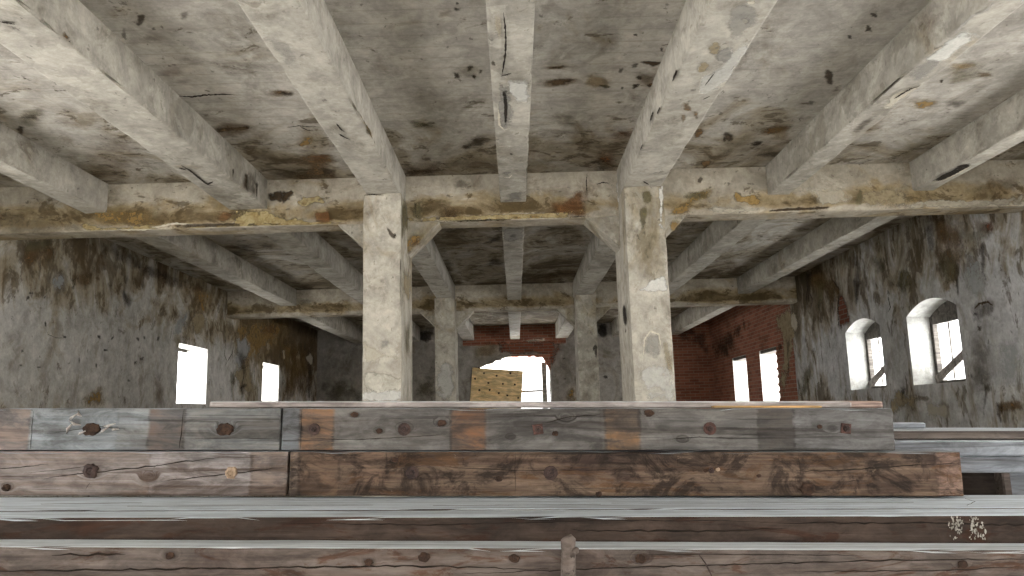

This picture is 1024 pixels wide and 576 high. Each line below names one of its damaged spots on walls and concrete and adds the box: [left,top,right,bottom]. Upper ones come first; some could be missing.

crack [181,92,233,100]
crack [502,12,511,76]
spalling [498,81,528,130]
peeling [886,33,970,106]
peeling [640,277,667,291]
leakage [926,216,963,293]
leakage [231,318,316,400]
peeling [643,330,673,398]
leakage [84,388,102,405]
leakage [997,401,1022,421]